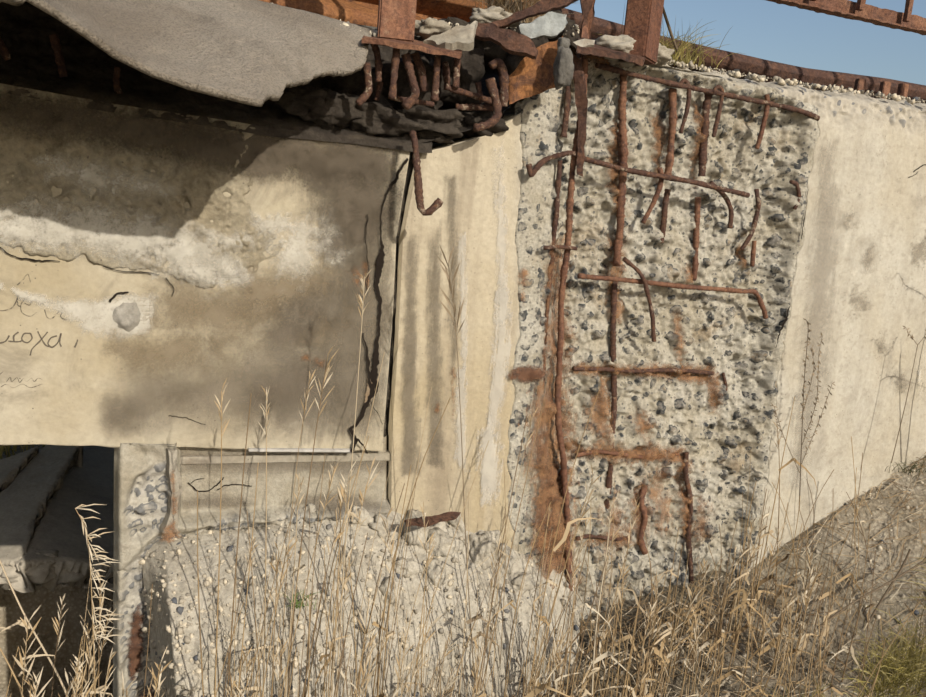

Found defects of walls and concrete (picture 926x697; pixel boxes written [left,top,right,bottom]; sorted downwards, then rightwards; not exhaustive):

crack [0,247,60,262]
crack [103,266,174,303]
damp [0,89,401,433]
peeling [0,1,433,290]
crack [349,158,408,454]
spalling [355,27,820,620]
corrosion [573,51,620,65]
corrosion [609,121,621,213]
corrosion [509,234,722,589]
spalling [0,549,59,585]